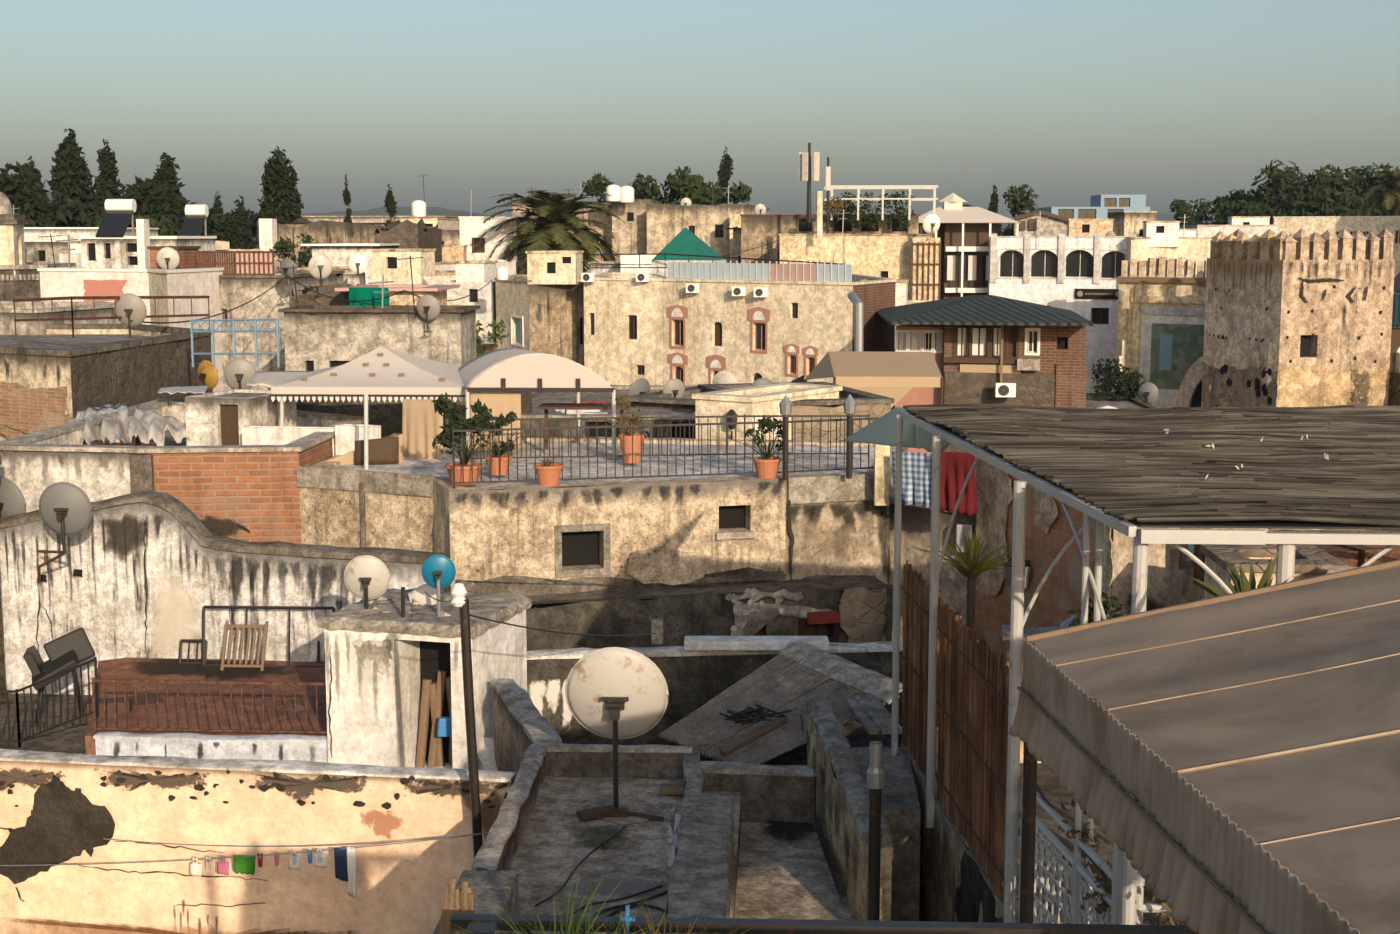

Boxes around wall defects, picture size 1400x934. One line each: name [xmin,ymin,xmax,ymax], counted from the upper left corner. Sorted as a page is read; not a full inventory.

damp [5,514,161,601]
damp [200,516,240,536]
damp [138,545,356,680]
spalling [456,567,887,644]
peeling [0,768,81,817]
peeling [94,768,508,810]